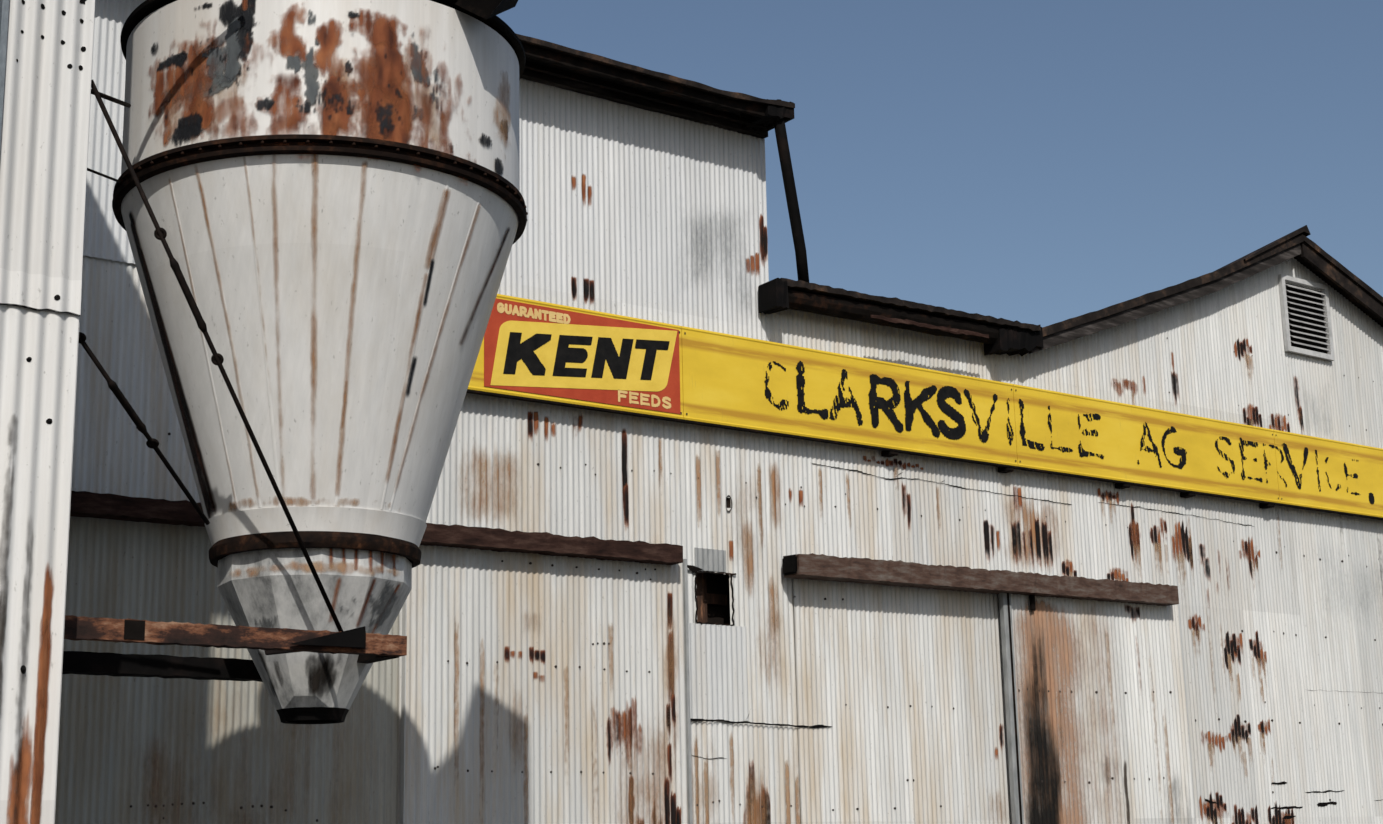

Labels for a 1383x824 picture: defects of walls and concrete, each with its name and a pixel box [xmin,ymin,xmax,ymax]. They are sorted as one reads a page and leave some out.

rust [149,37,245,145]
rust [259,5,460,148]
rust [1234,338,1252,364]
rust [337,391,346,488]
rust [984,487,1077,577]
rust [7,567,53,824]
rust [607,593,709,824]
rust [730,737,800,824]
rust [1019,600,1087,824]
rust [1188,615,1267,696]
rust [1203,714,1271,752]
rust [1199,792,1294,824]